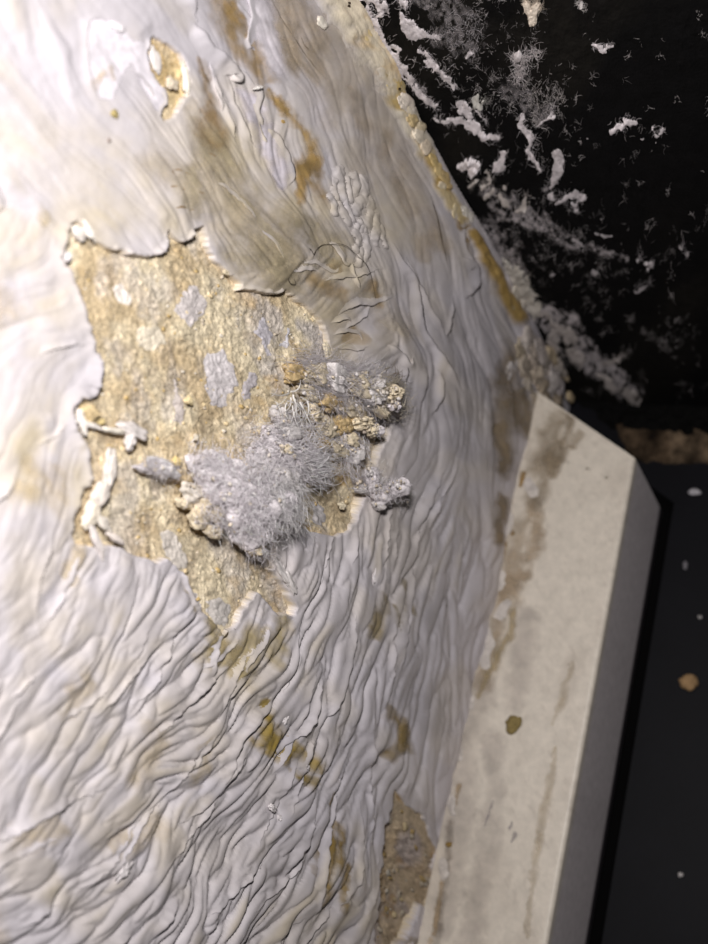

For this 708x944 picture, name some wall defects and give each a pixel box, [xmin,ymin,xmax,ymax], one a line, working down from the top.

peeling [78,13,191,120]
peeling [176,0,296,186]
water stain [269,89,322,199]
water stain [314,0,642,406]
spalling [49,220,385,632]
water stain [132,333,425,568]
water stain [493,355,532,475]
water stain [370,612,383,638]
water stain [469,416,574,710]
spalling [374,791,452,944]